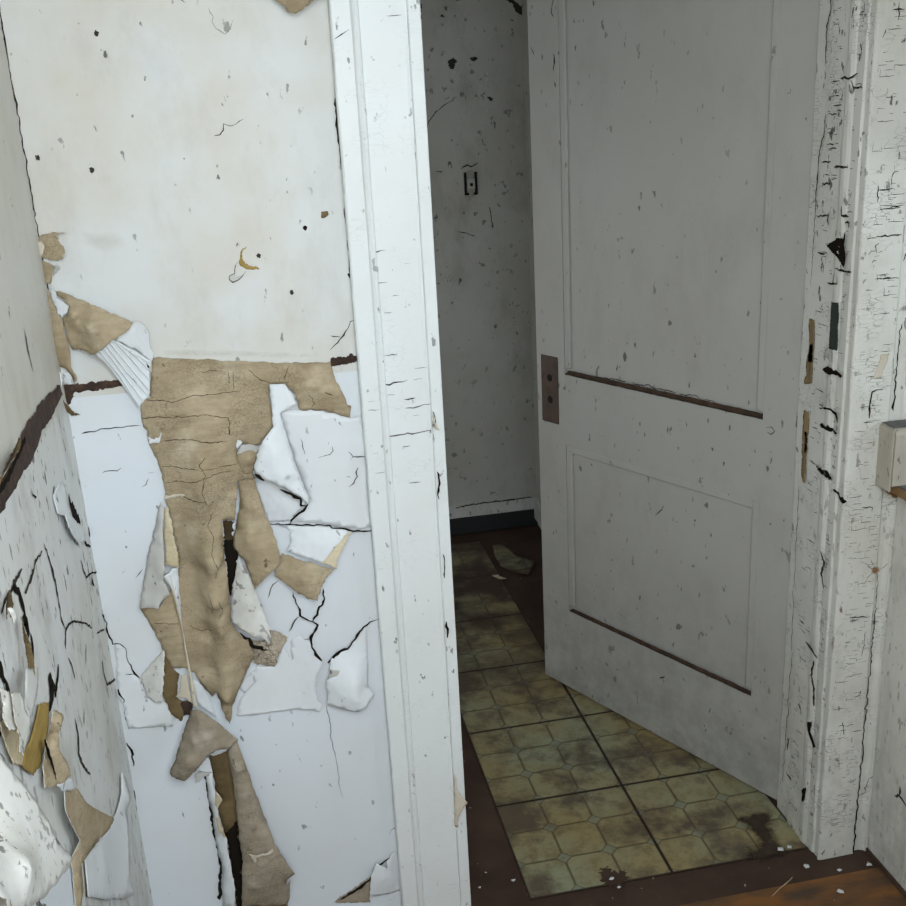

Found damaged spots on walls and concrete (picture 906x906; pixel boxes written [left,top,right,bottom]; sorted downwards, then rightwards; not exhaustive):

crack [782,0,906,853]
peeling [53,482,85,546]
peeling [254,384,371,569]
peeling [114,644,173,729]
peeling [139,502,182,622]
peeling [231,557,272,644]
crack [240,633,268,651]
peeling [236,627,374,716]
crack [268,583,379,663]
peeling [0,590,135,906]
peeling [206,773,243,906]
peeling [335,852,400,903]